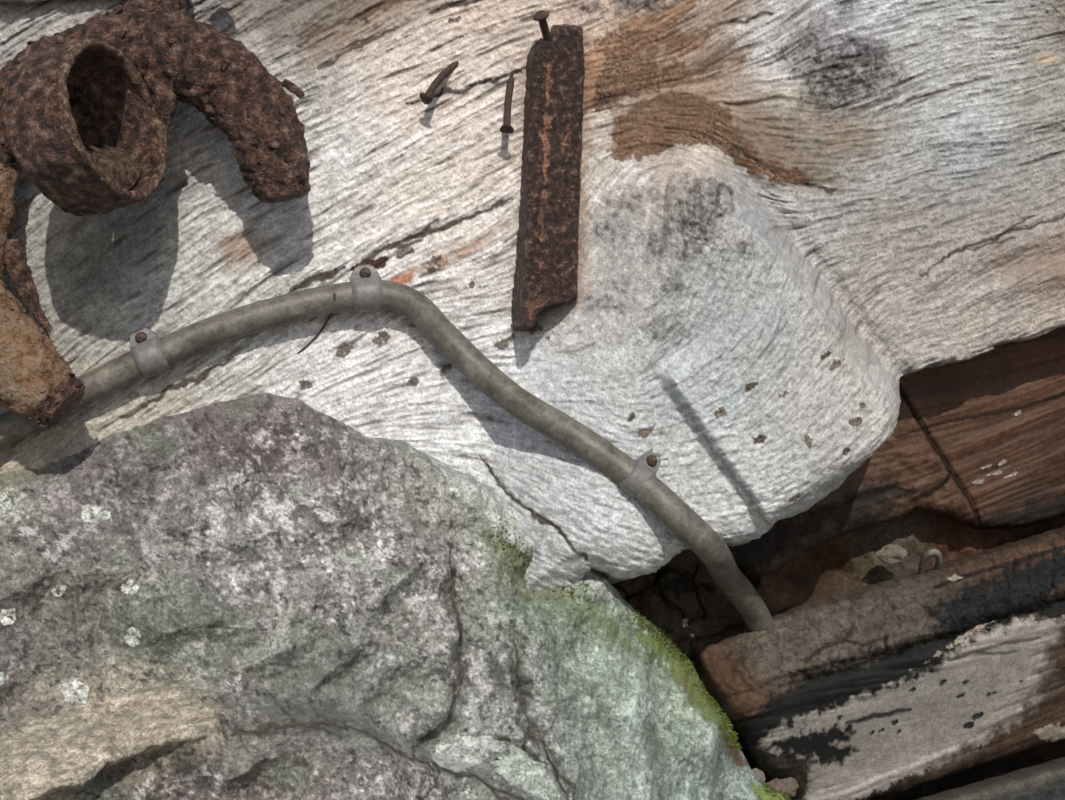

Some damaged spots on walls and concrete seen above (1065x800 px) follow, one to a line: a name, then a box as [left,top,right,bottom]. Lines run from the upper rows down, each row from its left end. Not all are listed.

peeling [754,614,1065,800]